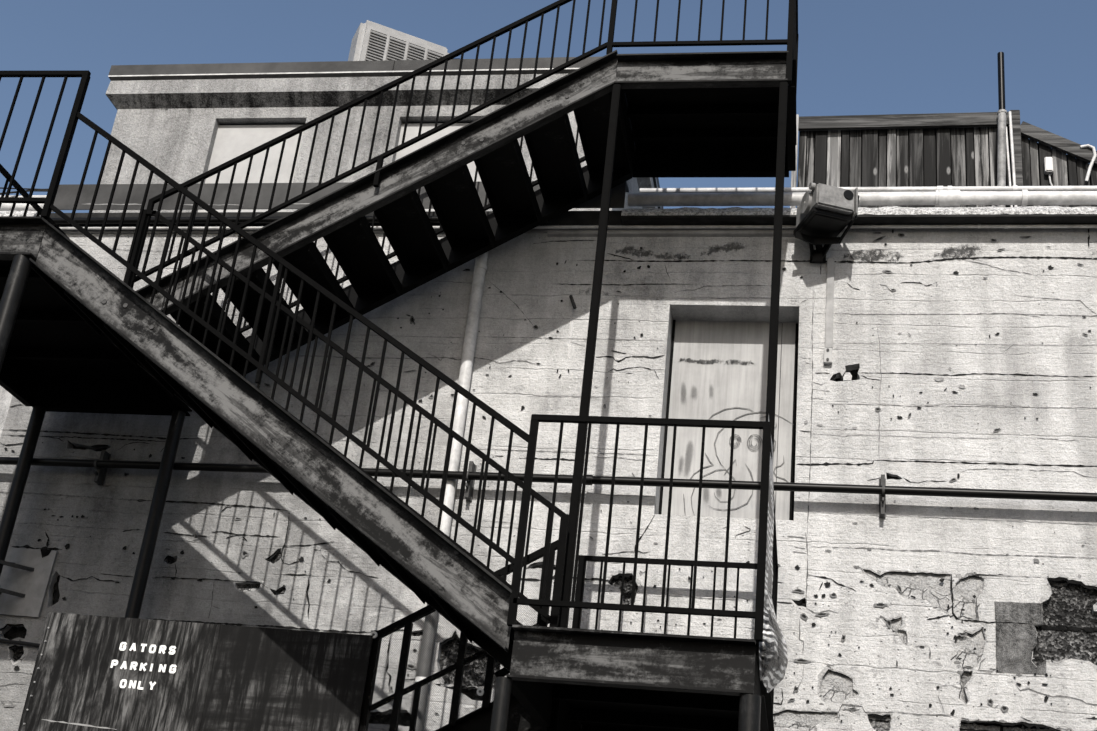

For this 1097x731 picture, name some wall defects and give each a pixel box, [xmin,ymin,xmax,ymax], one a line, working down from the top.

crack [533,229,1097,705]
crack [0,491,413,692]
spalling [792,582,837,626]
spalling [0,624,31,670]
spalling [853,565,1097,731]
crack [814,685,962,731]
crack [1016,685,1097,719]